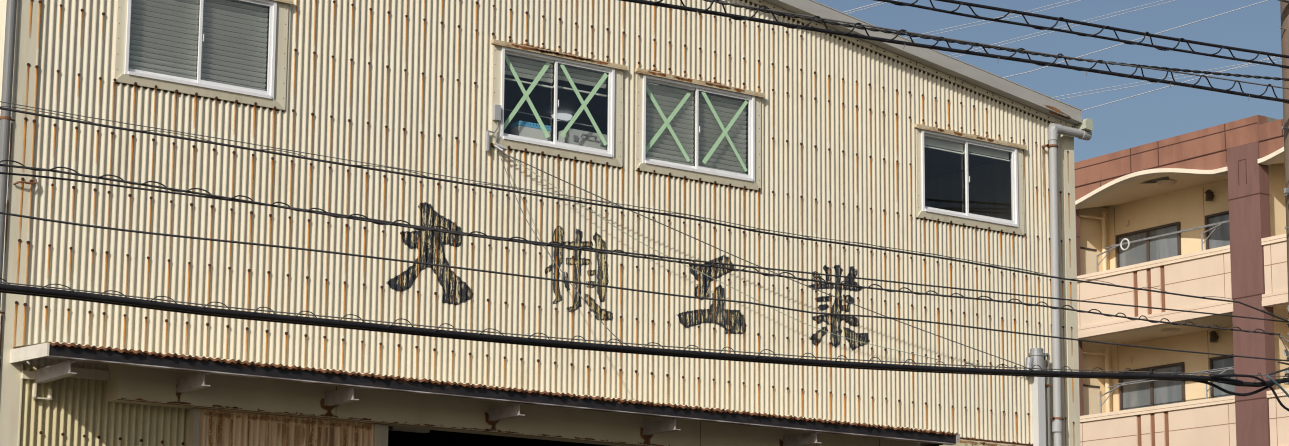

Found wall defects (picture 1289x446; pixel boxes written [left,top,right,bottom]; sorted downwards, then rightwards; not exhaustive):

corrosion [30,1,41,38]
corrosion [475,0,1025,197]
corrosion [5,66,38,282]
corrosion [452,139,1072,446]
corrosion [0,304,26,365]
corrosion [123,317,172,358]
corrosion [224,328,306,371]
corrosion [316,338,363,376]